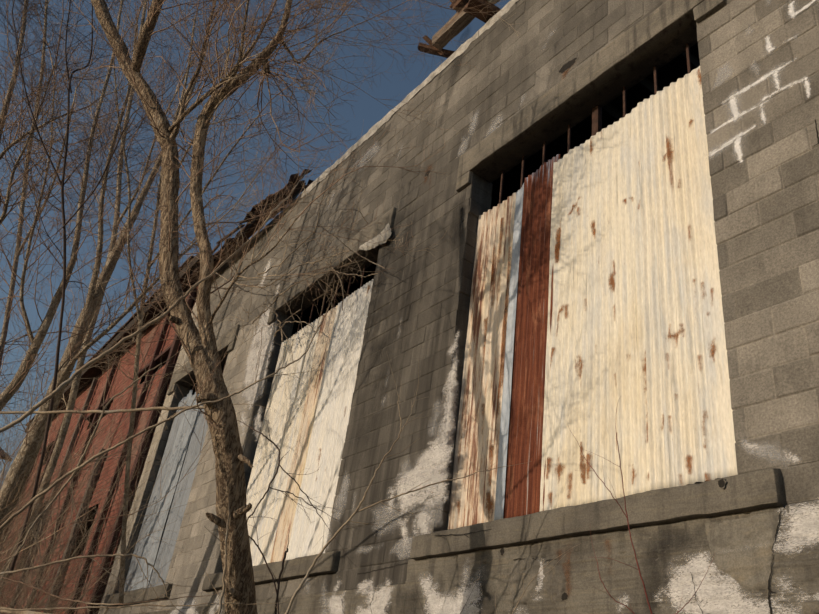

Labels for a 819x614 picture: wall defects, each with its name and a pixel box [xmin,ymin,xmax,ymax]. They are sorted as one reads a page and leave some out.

corrosion [664,138,679,187]
corrosion [491,218,511,415]
efflorescence [388,332,460,548]
corrosion [486,446,494,518]
corrosion [546,442,591,498]
efflorescence [772,500,819,555]
efflorescence [328,580,345,614]
efflorescence [355,579,393,614]
efflorescence [418,575,482,614]
leakage [654,552,800,614]
crack [768,509,781,614]